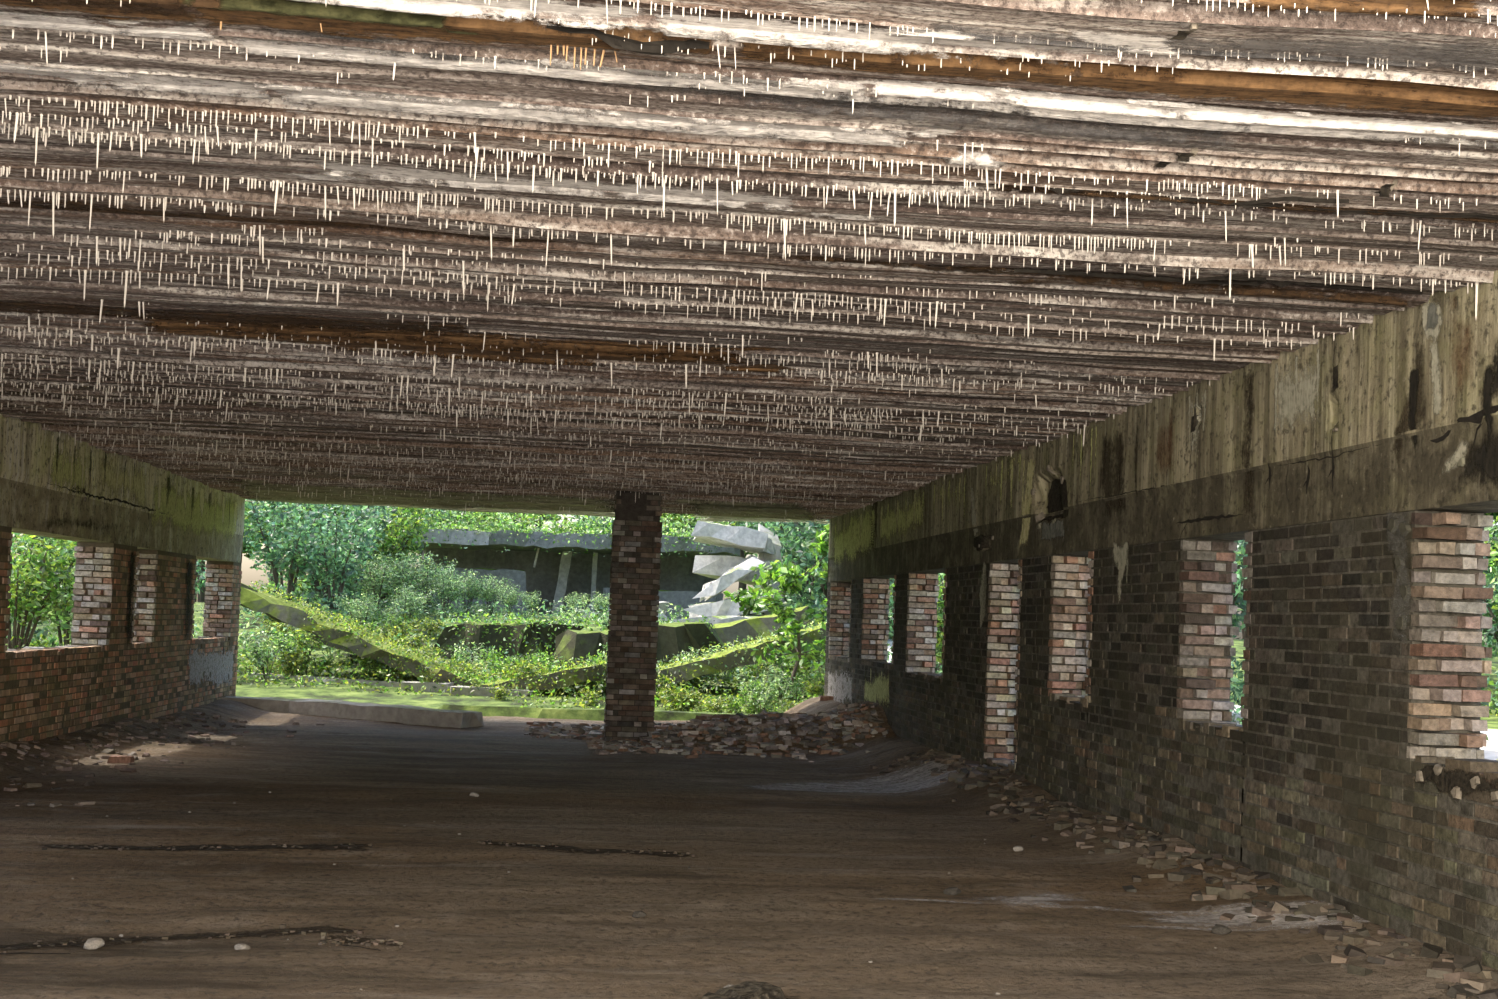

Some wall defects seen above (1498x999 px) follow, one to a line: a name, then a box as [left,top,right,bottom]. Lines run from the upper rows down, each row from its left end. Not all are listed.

damp [0,0,224,41]
damp [293,0,1498,72]
spalling [1171,23,1199,40]
damp [0,29,1498,156]
damp [286,162,874,221]
damp [940,152,1498,224]
damp [0,301,469,333]
damp [1274,349,1320,429]
damp [1394,302,1442,459]
damp [1461,347,1498,483]
crack [42,843,372,853]
crack [0,924,403,954]